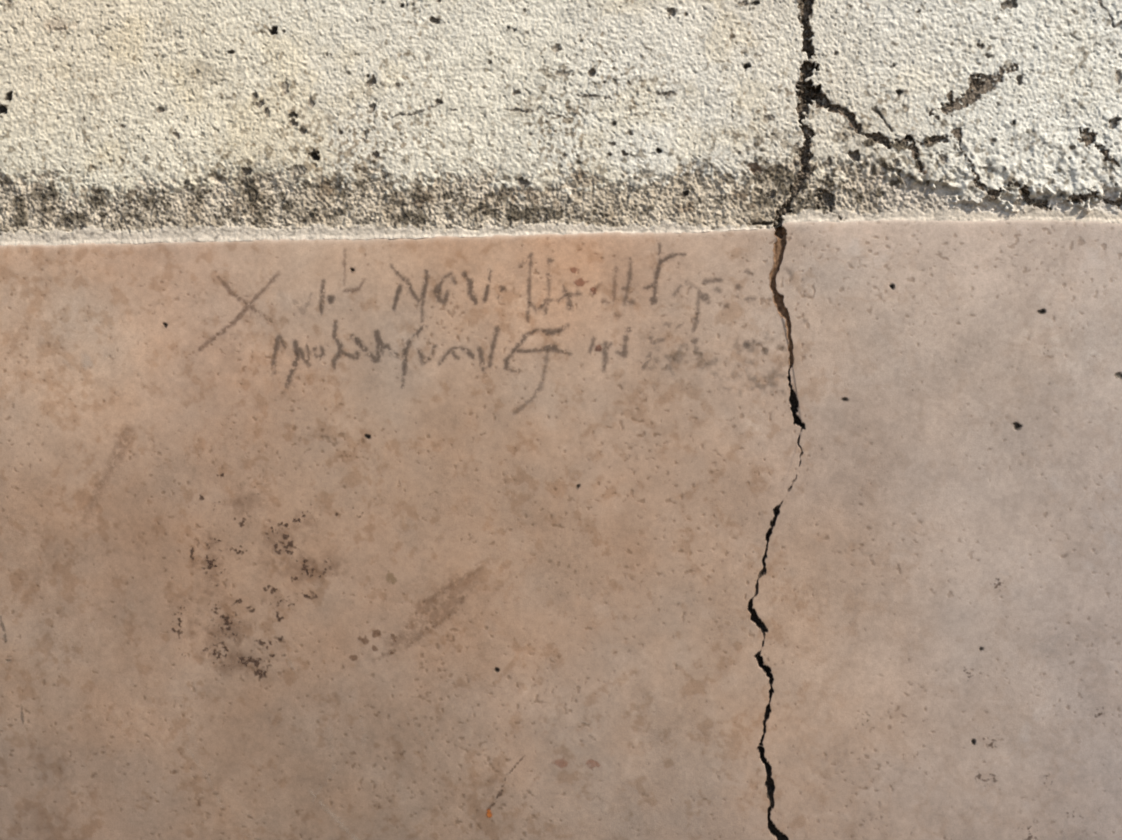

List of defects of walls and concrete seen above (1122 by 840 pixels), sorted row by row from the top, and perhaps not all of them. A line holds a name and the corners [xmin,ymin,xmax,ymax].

water stain [13,181,171,227]
water stain [186,172,227,201]
water stain [214,171,294,224]
water stain [310,178,370,219]
water stain [377,182,607,225]
water stain [752,170,778,207]
crack [749,0,1122,456]
crack [748,487,791,840]